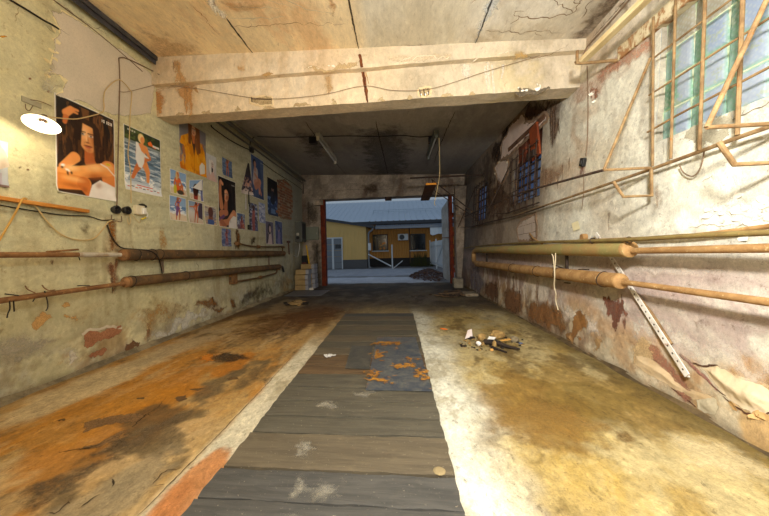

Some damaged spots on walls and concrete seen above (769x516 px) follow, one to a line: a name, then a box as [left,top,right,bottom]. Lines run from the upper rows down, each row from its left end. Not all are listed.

crack [195,0,359,53]
crack [474,0,593,59]
peeling [44,9,155,116]
rust [358,54,369,102]
spalling [494,111,549,185]
spalling [82,325,122,358]
spalling [125,329,150,351]